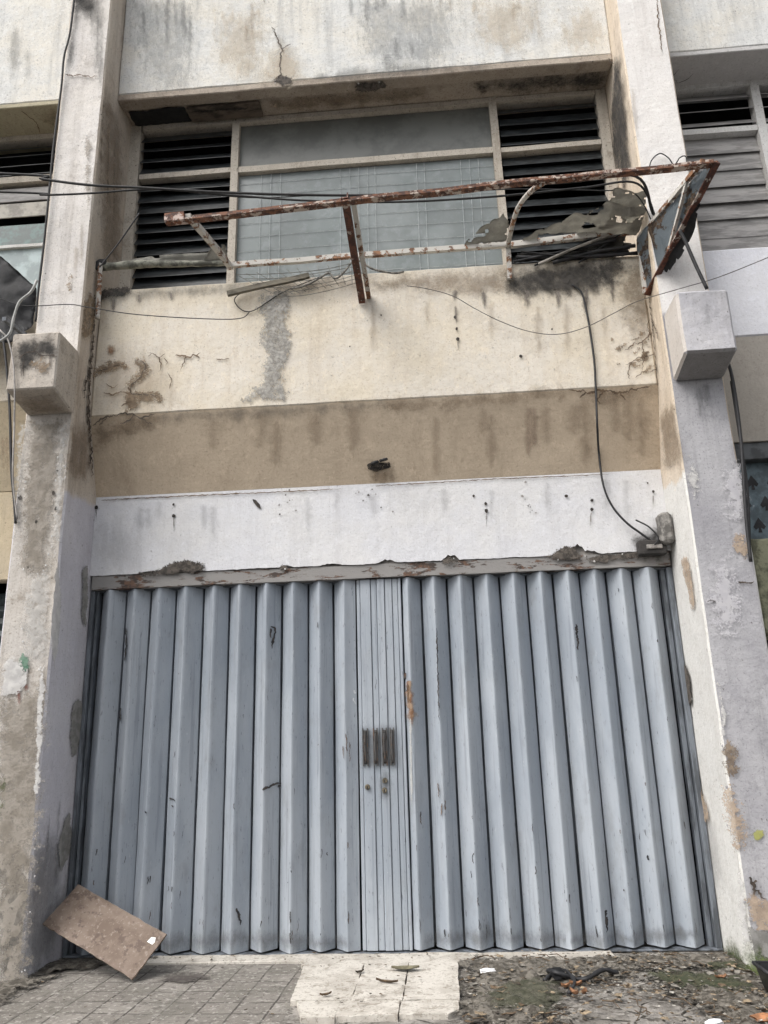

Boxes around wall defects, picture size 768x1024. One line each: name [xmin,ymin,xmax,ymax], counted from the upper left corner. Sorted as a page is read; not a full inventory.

crack [272,27,290,80]
leakage [506,257,626,308]
leakage [17,340,55,375]
crack [83,295,329,501]
crack [569,298,658,403]
peeling [681,557,695,610]
peeling [0,418,72,982]
peeling [719,740,748,851]